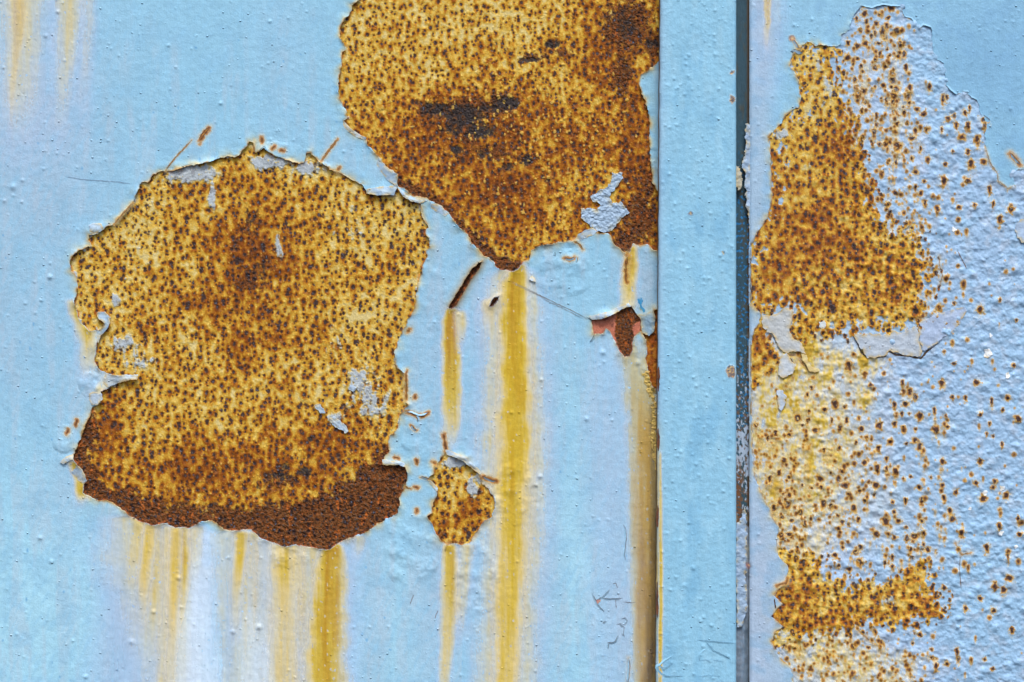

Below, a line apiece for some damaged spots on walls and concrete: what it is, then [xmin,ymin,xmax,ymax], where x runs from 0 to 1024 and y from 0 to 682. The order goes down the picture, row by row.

peeling [768,132,792,221]
corrosion [60,0,664,682]
peeling [749,236,823,417]
peeling [789,4,1024,682]
peeling [776,646,819,682]